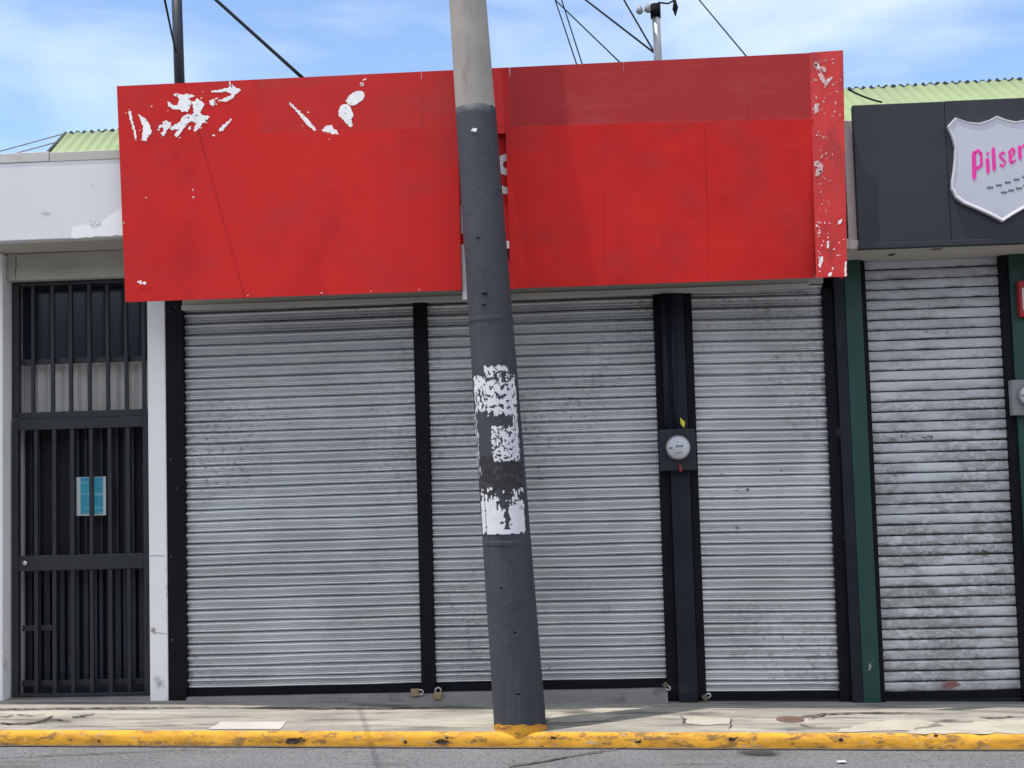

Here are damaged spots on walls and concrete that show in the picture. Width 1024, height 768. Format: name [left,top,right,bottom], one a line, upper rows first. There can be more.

peeling [128,81,240,141]
peeling [289,78,366,140]
peeling [813,59,841,117]
peeling [814,131,847,276]